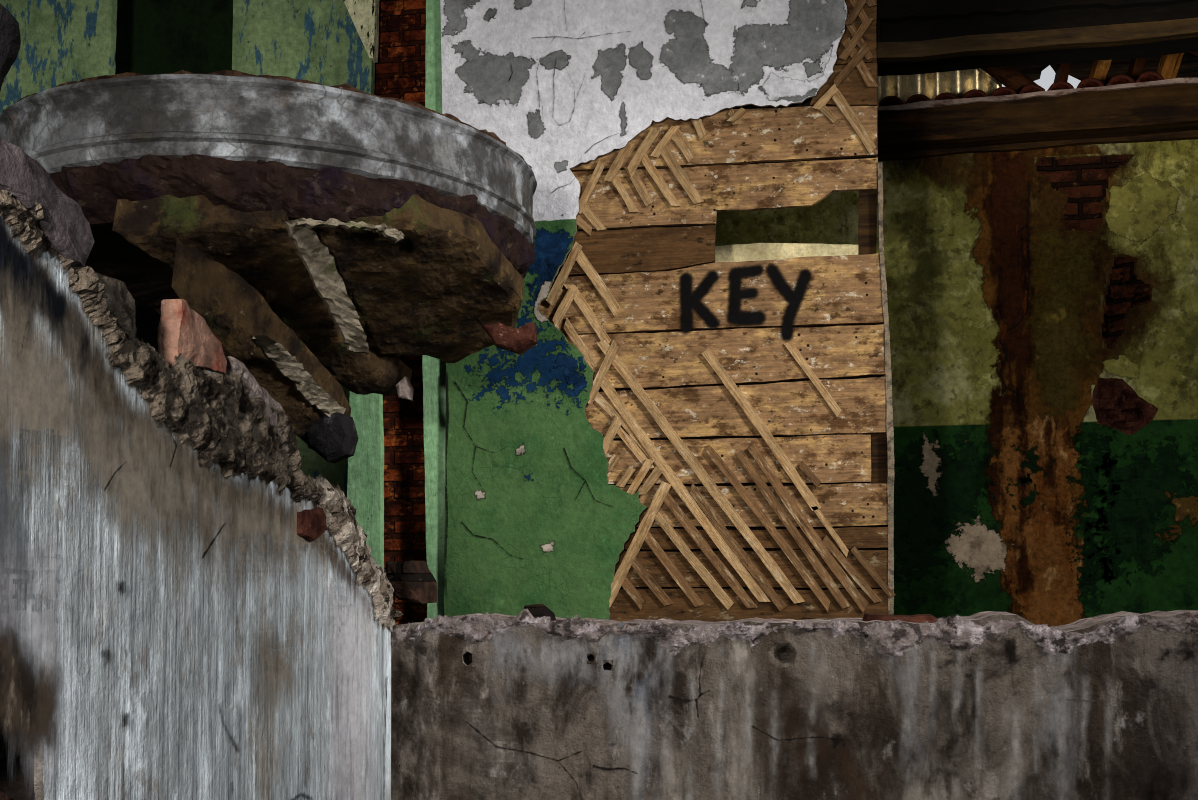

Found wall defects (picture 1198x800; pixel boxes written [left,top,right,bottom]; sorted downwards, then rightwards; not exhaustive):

peeling [442,0,571,139]
peeling [591,0,847,136]
peeling [554,160,569,173]
spalling [1036,155,1128,231]
leakage [0,218,372,800]
crack [444,372,523,591]
crack [564,448,613,507]
spalling [0,189,1198,664]
rust [964,144,1114,627]
leakage [391,699,423,800]
leakage [626,686,647,780]
leakage [768,695,957,800]